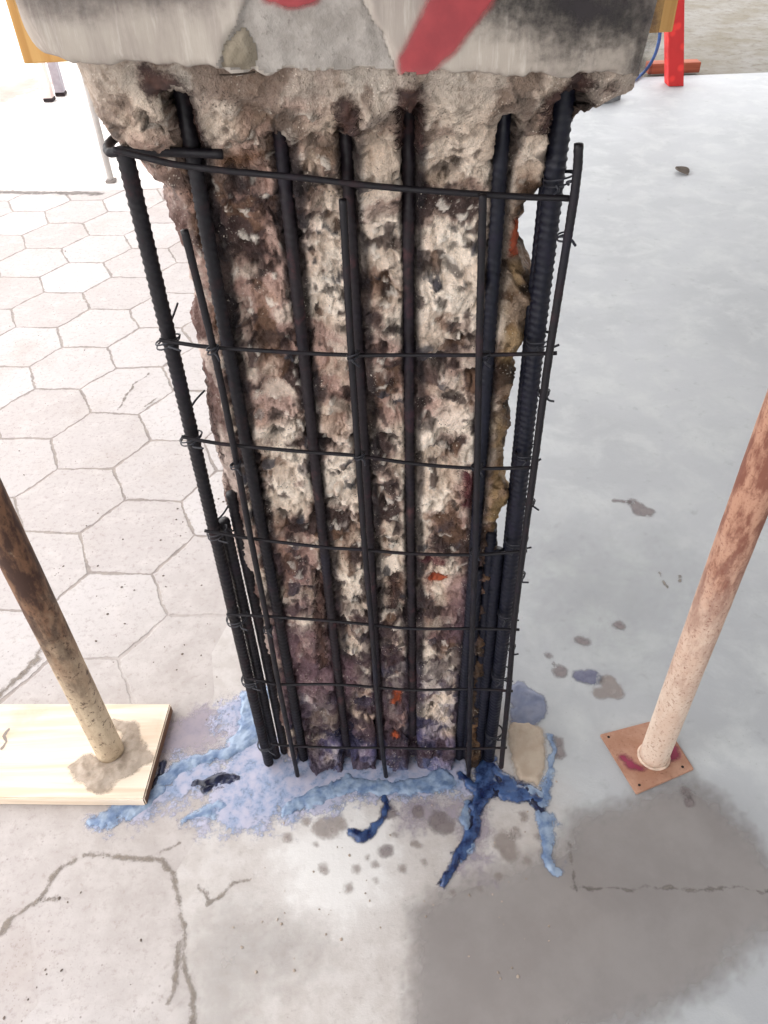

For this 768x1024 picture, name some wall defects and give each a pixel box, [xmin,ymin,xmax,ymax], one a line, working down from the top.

spalling [76,0,639,776]
water stain [612,499,654,516]
water stain [546,654,623,698]
water stain [304,817,345,836]
water stain [374,845,392,866]
water stain [413,786,768,1024]
crack [568,843,632,892]
crack [663,884,723,892]
crack [0,842,250,1024]